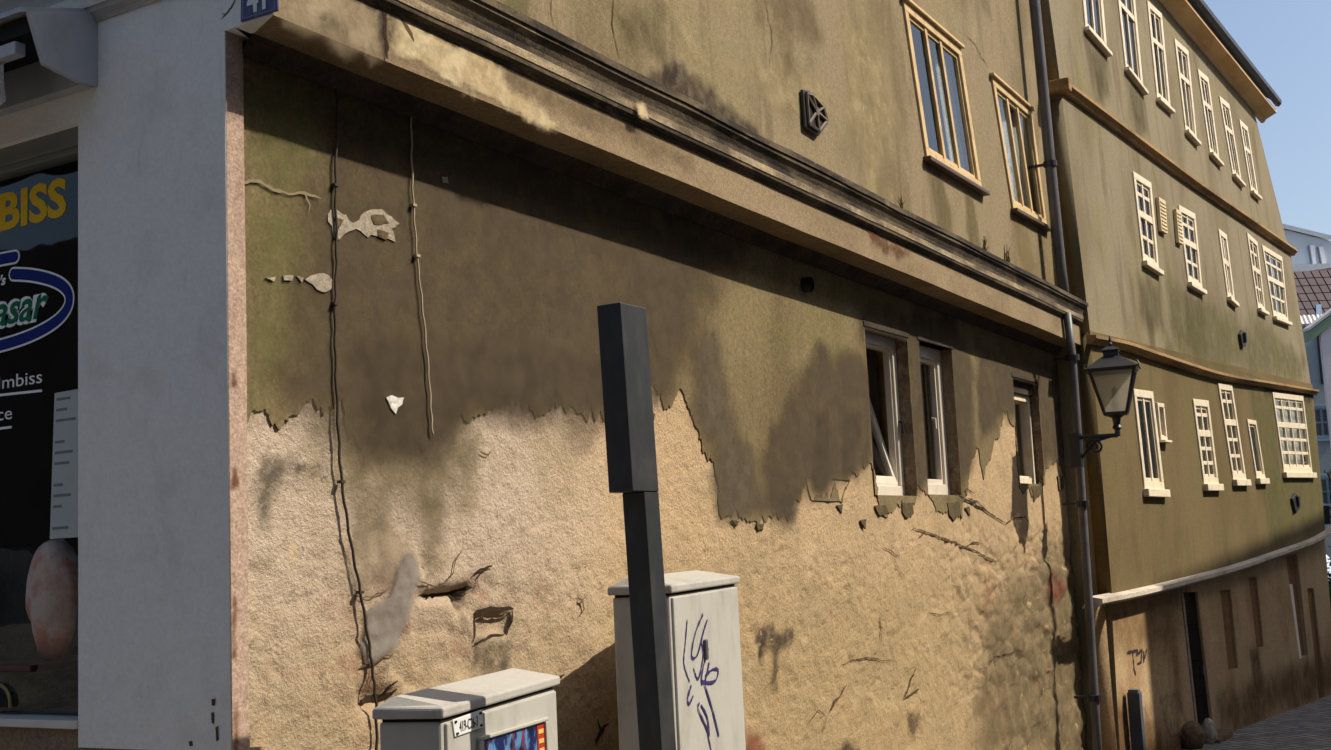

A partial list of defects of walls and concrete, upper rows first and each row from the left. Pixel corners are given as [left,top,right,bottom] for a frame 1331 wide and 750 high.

peeling [289,0,559,130]
spalling [327,209,400,242]
spalling [265,273,333,292]
water stain [291,104,871,519]
spalling [386,395,404,414]
water stain [262,460,284,514]
crack [885,488,1033,574]
crack [358,547,492,599]
peeling [247,399,628,750]
peeling [652,389,1087,750]
crack [360,653,394,689]